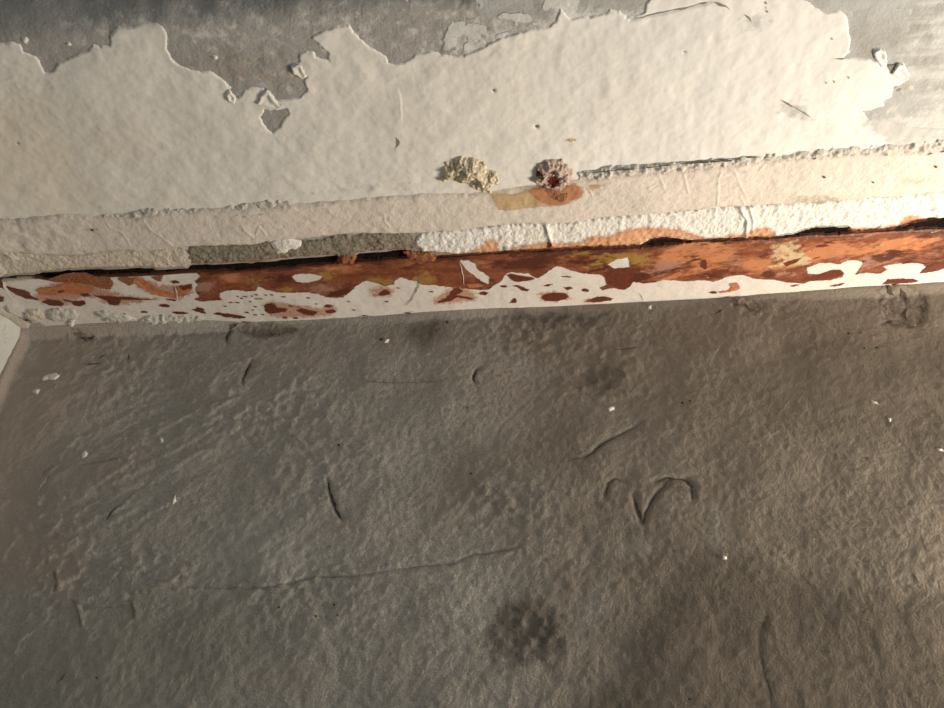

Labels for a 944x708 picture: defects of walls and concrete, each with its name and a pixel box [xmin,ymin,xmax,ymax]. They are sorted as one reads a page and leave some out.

peeling [442,13,537,55]
peeling [291,64,307,79]
peeling [873,48,910,81]
peeling [257,90,284,110]
corrosion [0,216,944,322]
crack [567,425,639,462]
crack [328,481,341,518]
crack [605,477,693,523]
crack [52,547,518,627]
crack [759,620,772,708]